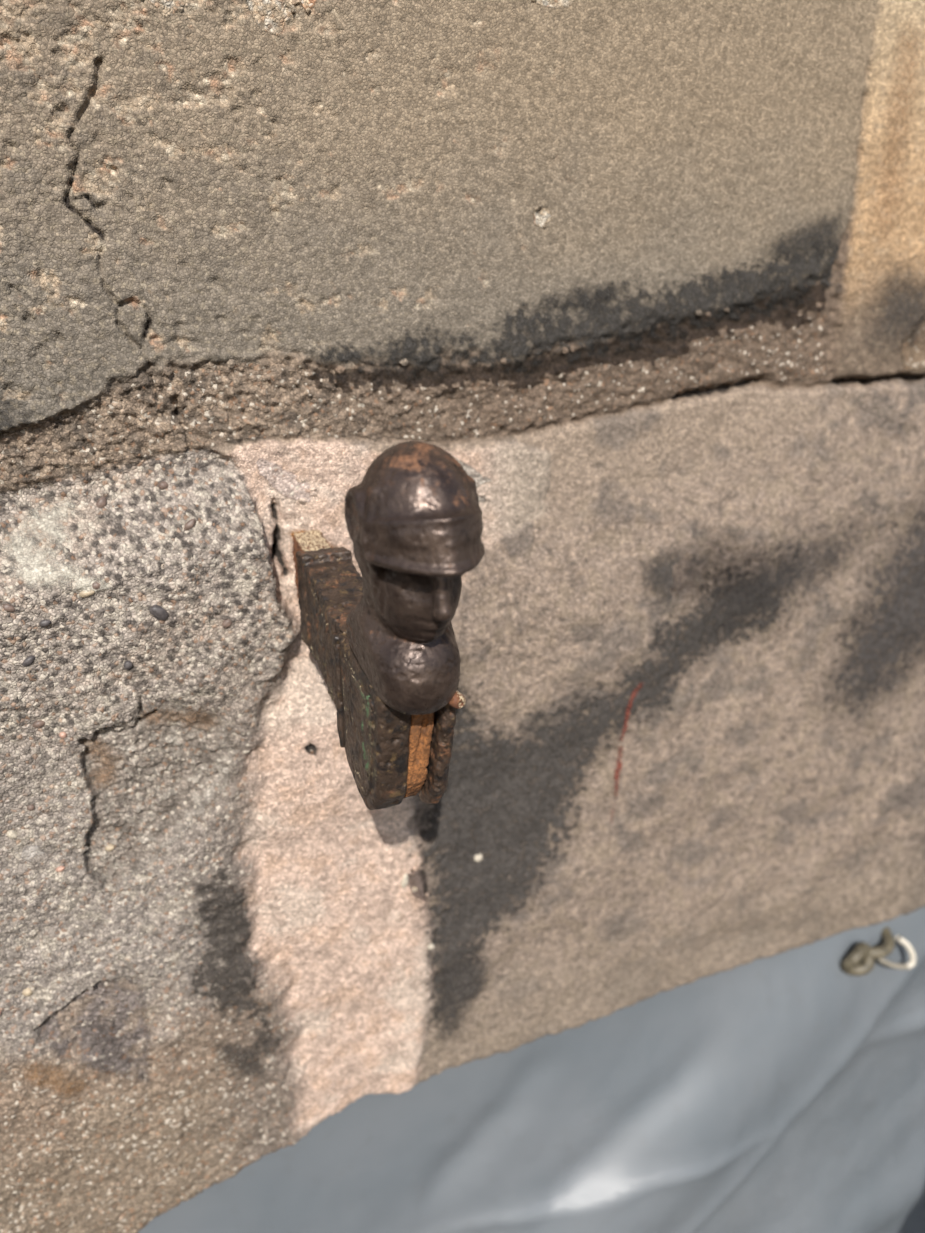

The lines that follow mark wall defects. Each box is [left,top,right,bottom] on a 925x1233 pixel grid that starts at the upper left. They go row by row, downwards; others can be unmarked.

crack [65,131,104,239]
crack [143,314,152,342]
damp [824,501,925,721]
damp [409,535,853,1039]